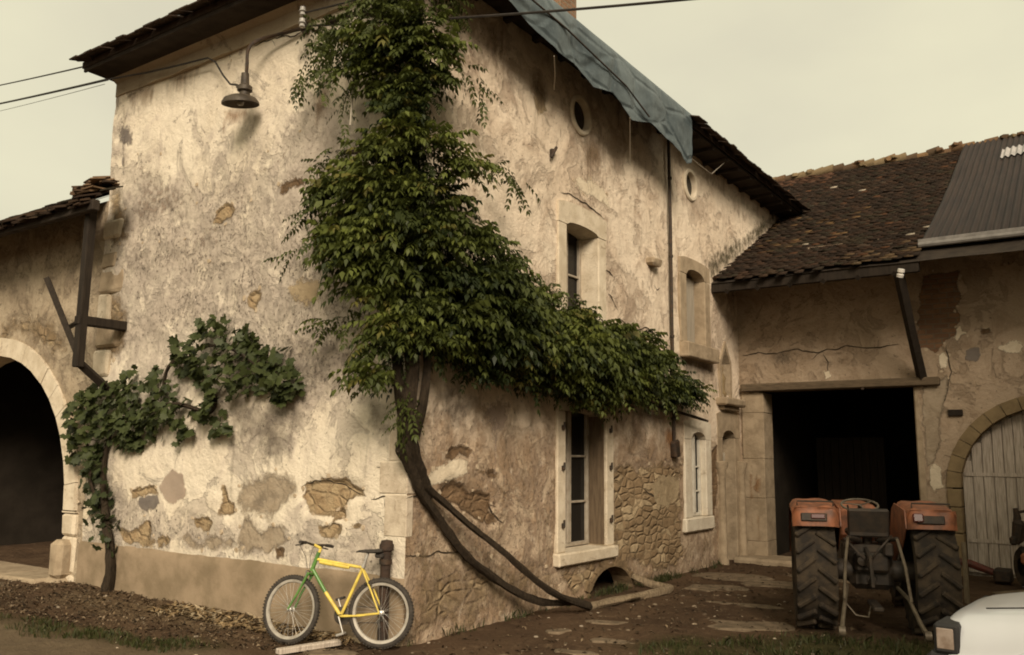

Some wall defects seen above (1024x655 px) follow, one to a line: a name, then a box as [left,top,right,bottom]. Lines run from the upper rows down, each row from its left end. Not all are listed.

flaking render [276,177,309,195]
flaking render [200,189,235,246]
flaking render [242,285,261,312]
crack [742,344,898,370]
peeling [996,340,1023,353]
flaking render [915,270,990,492]
peeling [130,485,158,498]
flaking render [428,443,499,524]
peeling [119,514,170,548]
flaking render [183,468,365,560]